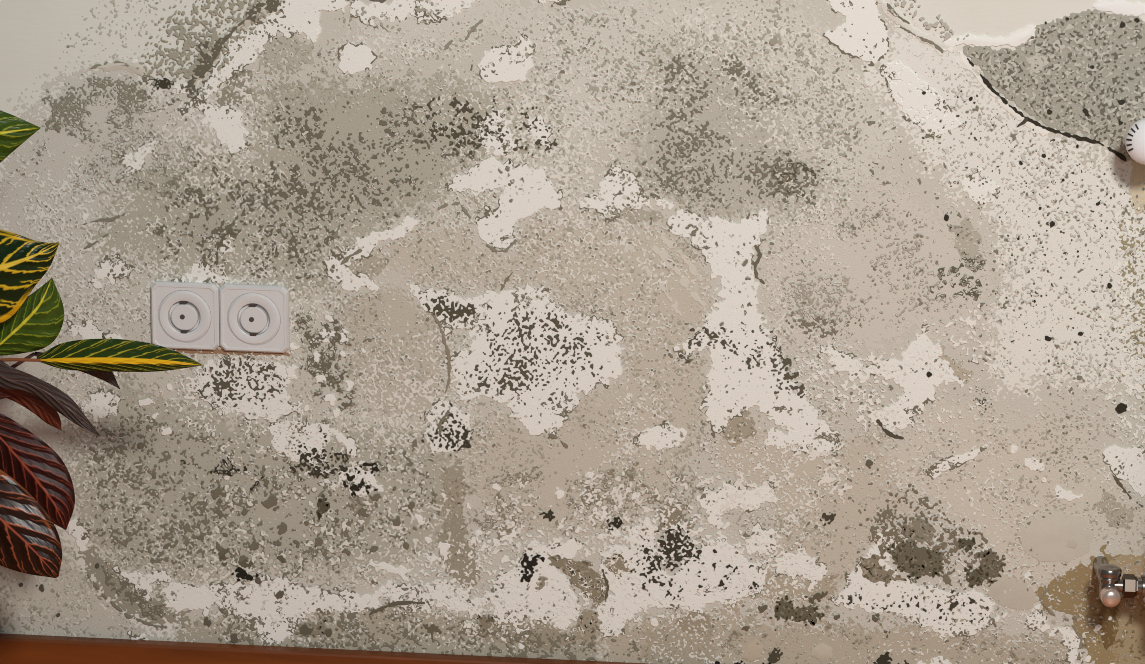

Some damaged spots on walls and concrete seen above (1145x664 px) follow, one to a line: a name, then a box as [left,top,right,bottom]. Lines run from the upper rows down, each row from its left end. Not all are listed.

damp [192,0,349,104]
damp [154,76,177,90]
damp [173,82,196,116]
crack [887,3,1127,161]
peeling [0,0,1145,530]
peeling [4,347,1098,664]
damp [696,481,730,529]
damp [863,531,897,559]
damp [878,552,897,578]
damp [887,540,944,583]
damp [526,522,767,663]
damp [127,630,148,640]